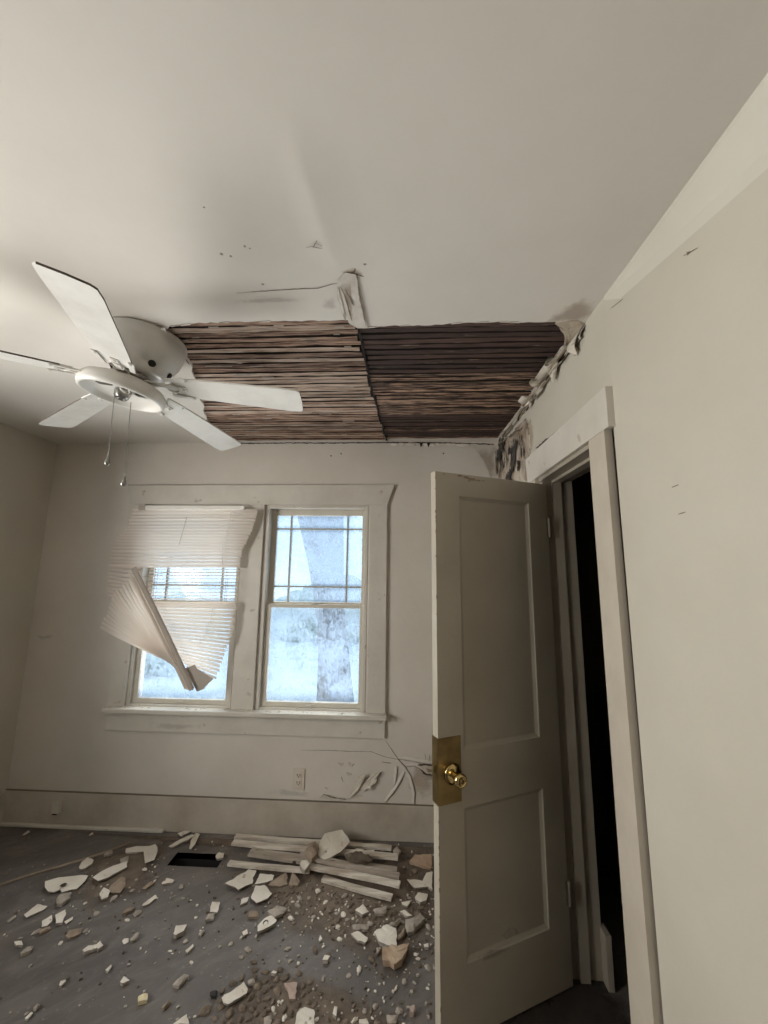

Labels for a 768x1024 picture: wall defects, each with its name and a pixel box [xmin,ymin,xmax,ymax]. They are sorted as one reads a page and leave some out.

crack [244,268,364,293]
spalling [241,323,585,482]
crack [320,743,432,804]